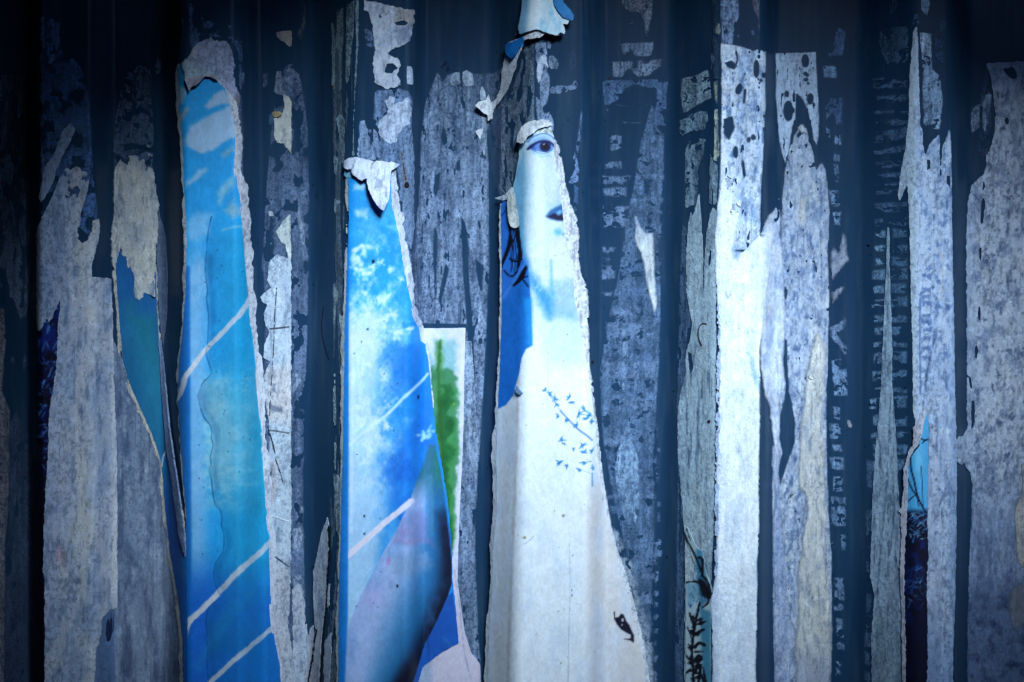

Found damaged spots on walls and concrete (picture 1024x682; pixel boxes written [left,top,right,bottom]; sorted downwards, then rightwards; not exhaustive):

peeling [357,96,415,249]